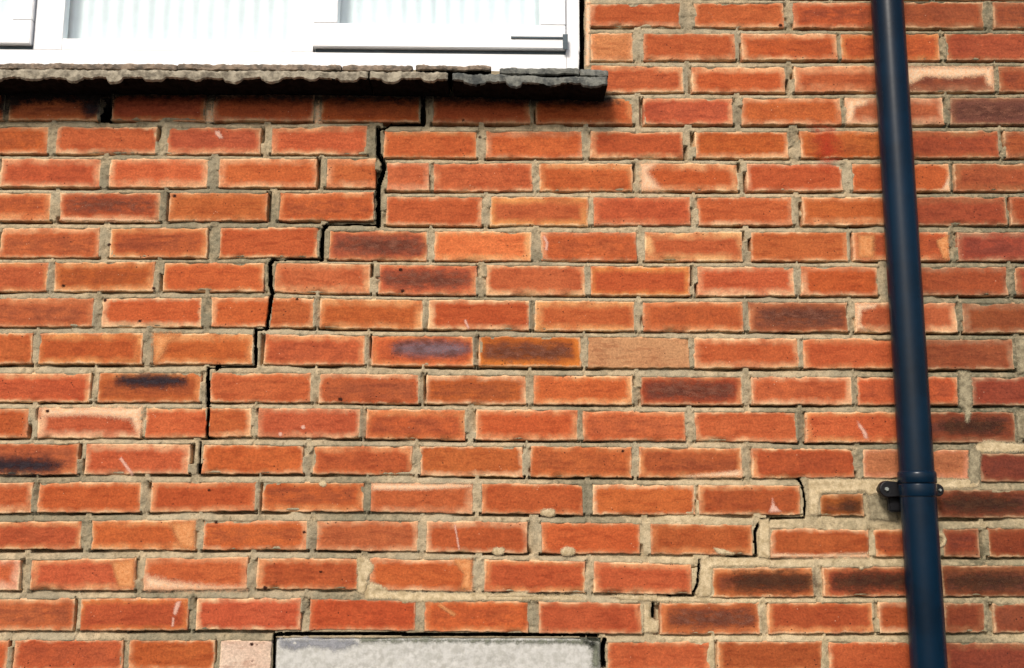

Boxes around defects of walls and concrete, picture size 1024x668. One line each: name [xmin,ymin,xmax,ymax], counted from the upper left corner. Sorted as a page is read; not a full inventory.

crack [199,100,426,474]
crack [726,478,806,557]
crack [643,560,701,631]